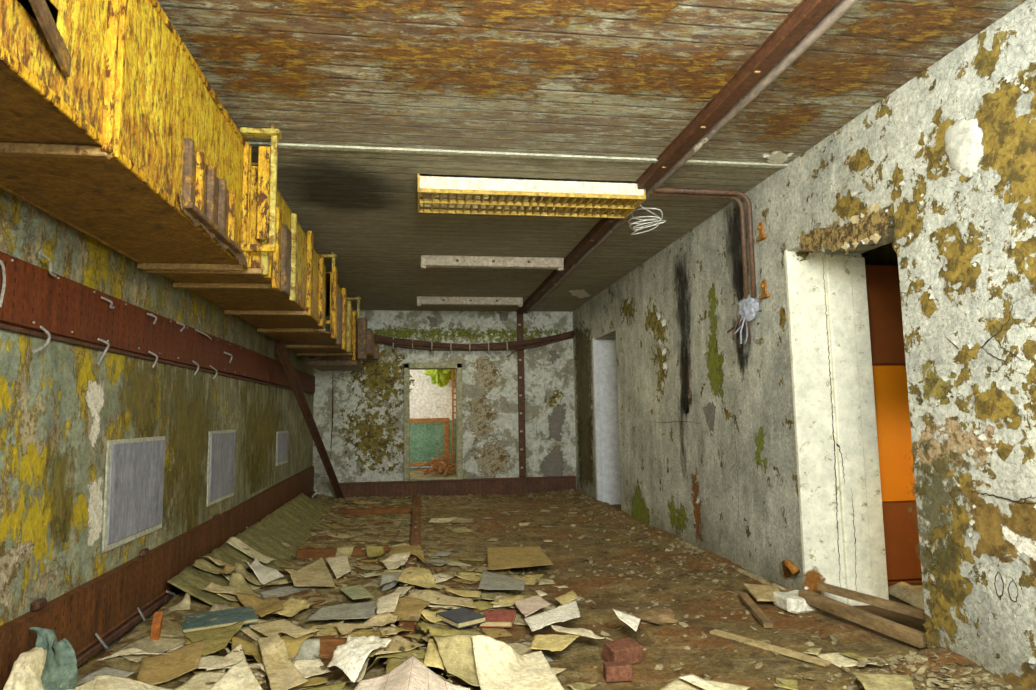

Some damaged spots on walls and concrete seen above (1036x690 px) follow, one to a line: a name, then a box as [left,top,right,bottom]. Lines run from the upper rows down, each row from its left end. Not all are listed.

peeling [918,68,1036,299]
damp [726,207,747,301]
spalling [796,145,991,321]
peeling [85,380,105,449]
peeling [338,343,415,478]
peeling [462,352,517,478]
peeling [540,390,566,476]
damp [675,257,691,474]
damp [733,321,749,374]
peeling [86,476,103,547]
peeling [0,541,35,608]